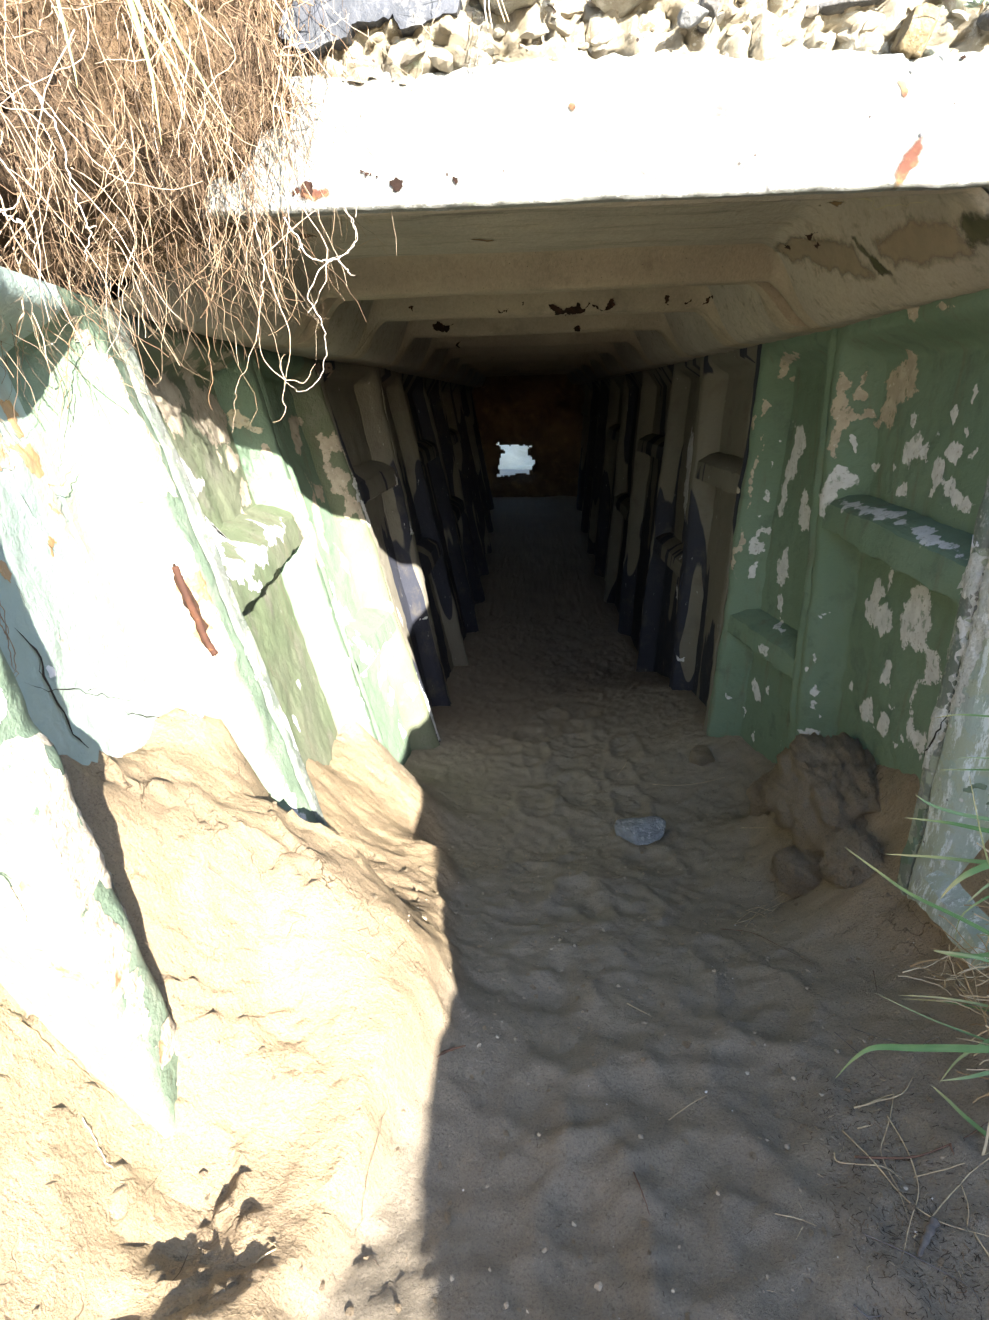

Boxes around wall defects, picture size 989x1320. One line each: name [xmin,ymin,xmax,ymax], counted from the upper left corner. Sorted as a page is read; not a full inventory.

hole [549,298,615,332]
peeling [0,399,44,478]
peeling [0,560,12,583]
spalling [62,301,300,754]
peeling [141,331,441,741]
spalling [725,349,989,769]
crack [15,585,159,748]
peeling [267,763,308,822]
spalling [0,732,180,1069]